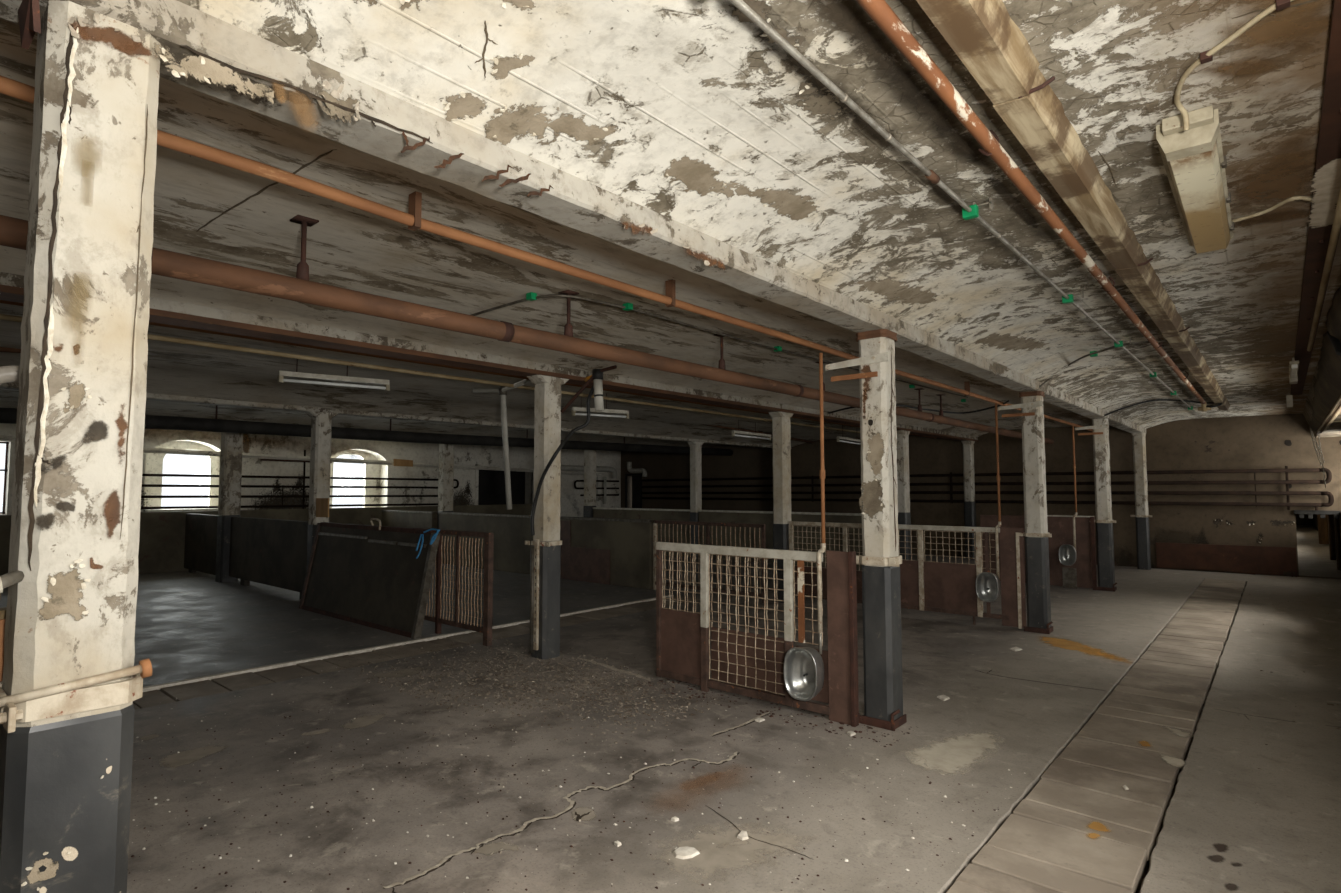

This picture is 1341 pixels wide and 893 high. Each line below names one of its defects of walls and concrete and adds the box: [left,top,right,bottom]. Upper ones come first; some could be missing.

peeling [68,13,274,104]
crack [475,21,496,78]
peeling [490,53,535,80]
peeling [719,0,808,50]
spalling [313,81,361,123]
crack [180,45,554,197]
peeling [440,93,616,146]
crack [197,149,337,231]
peeling [661,155,819,221]
peeling [857,277,938,307]
peeling [859,432,885,522]
crack [384,712,770,893]